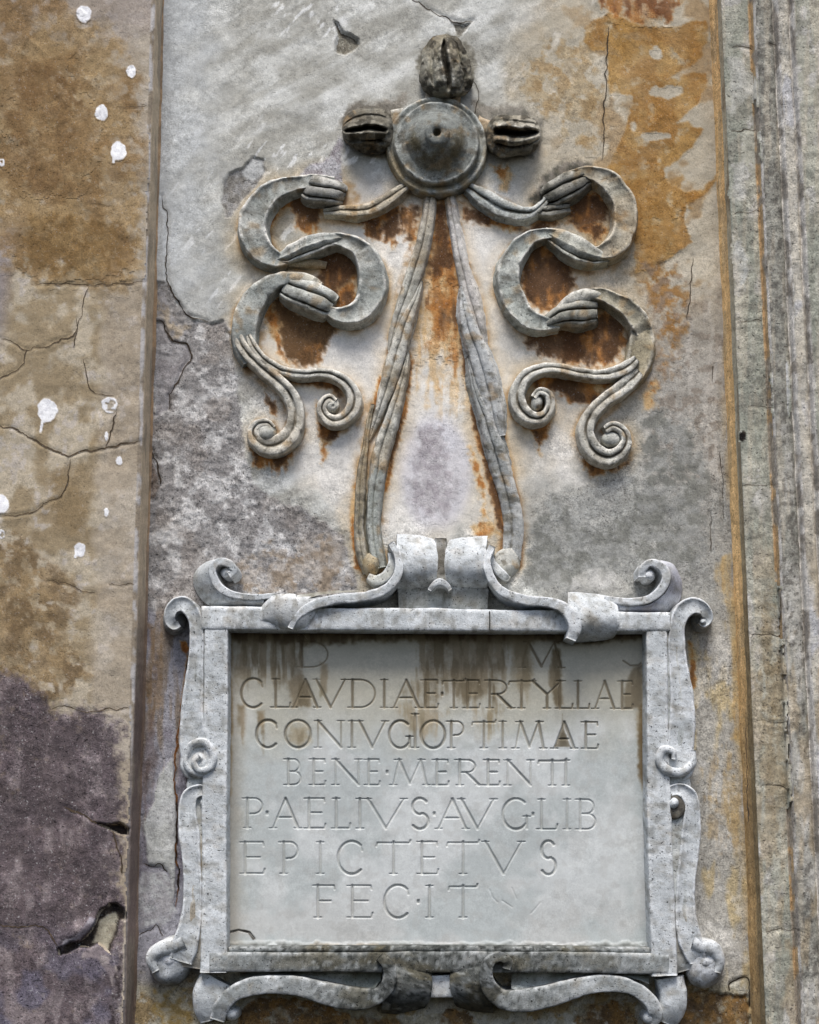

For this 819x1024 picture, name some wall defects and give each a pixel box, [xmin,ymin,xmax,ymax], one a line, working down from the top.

damp [0,0,150,300]
crack [0,200,208,517]
peeling [220,155,267,219]
corrosion [261,297,343,369]
corrosion [314,252,357,307]
corrosion [350,197,423,261]
corrosion [384,190,637,542]
corrosion [582,0,717,275]
crack [46,580,132,593]
damp [0,519,131,1024]
peeling [56,758,179,1024]
crack [53,661,188,902]